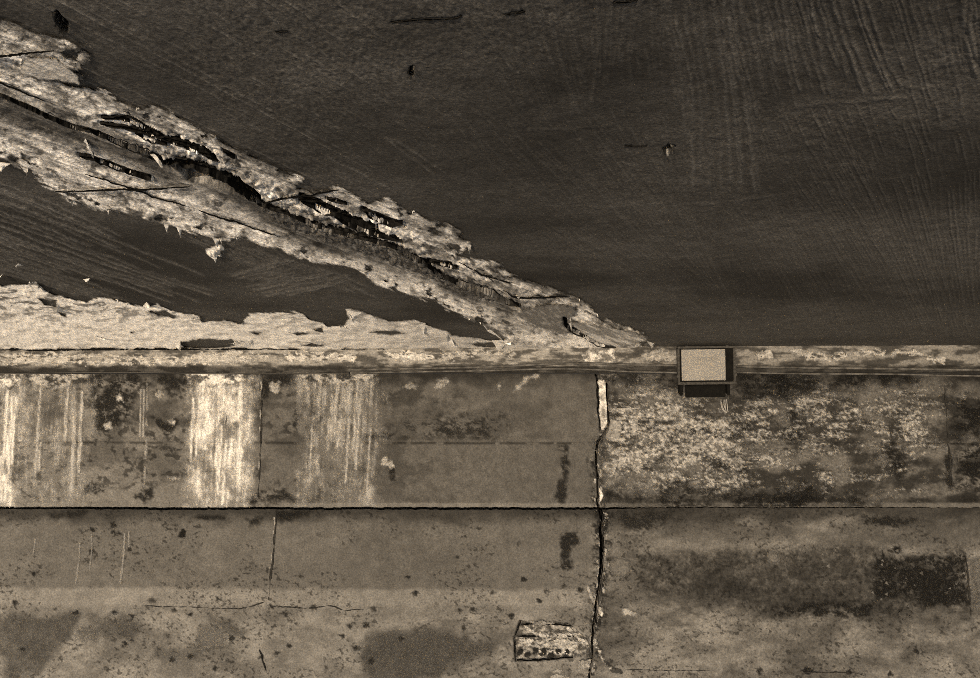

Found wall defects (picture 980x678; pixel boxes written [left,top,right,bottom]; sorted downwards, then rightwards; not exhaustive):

crack [391,14,462,23]
crack [504,9,525,17]
crack [0,50,54,58]
peeling [0,11,656,350]
crack [0,82,708,678]
damp [0,374,89,507]
damp [188,374,250,505]
damp [299,374,375,484]
damp [119,532,130,583]
damp [0,614,136,678]
damp [363,631,492,678]
spalling [508,613,591,671]